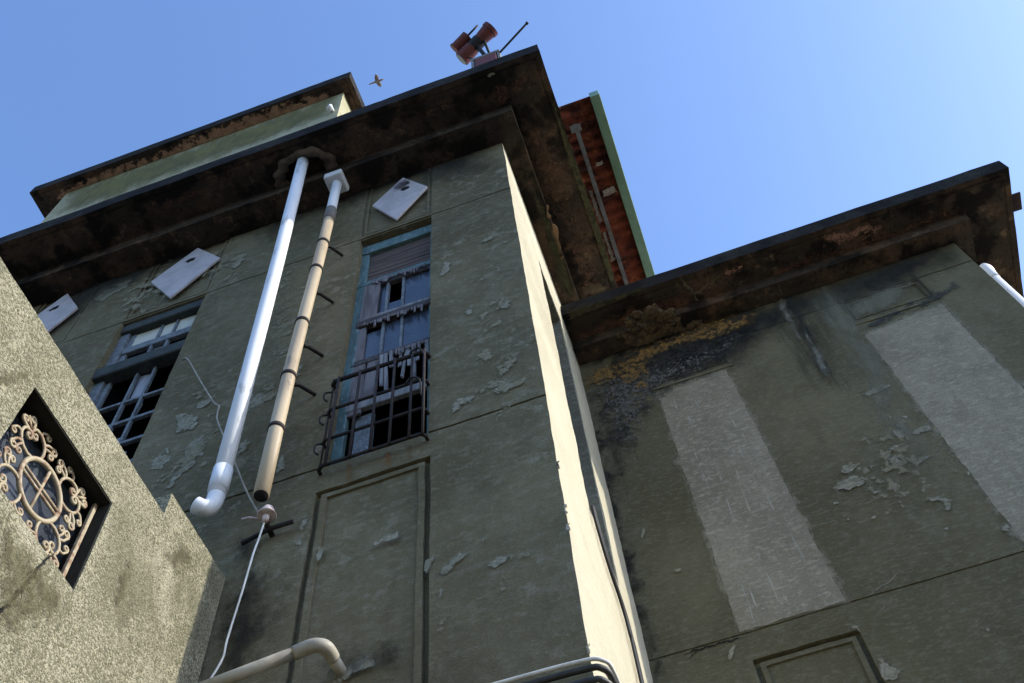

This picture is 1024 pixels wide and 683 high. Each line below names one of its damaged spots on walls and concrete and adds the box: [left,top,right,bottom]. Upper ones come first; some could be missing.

peeling [94,260,171,315]
peeling [452,263,535,421]
peeling [149,384,223,488]
water stain [590,336,738,465]
peeling [831,411,956,522]
peeling [424,552,467,577]